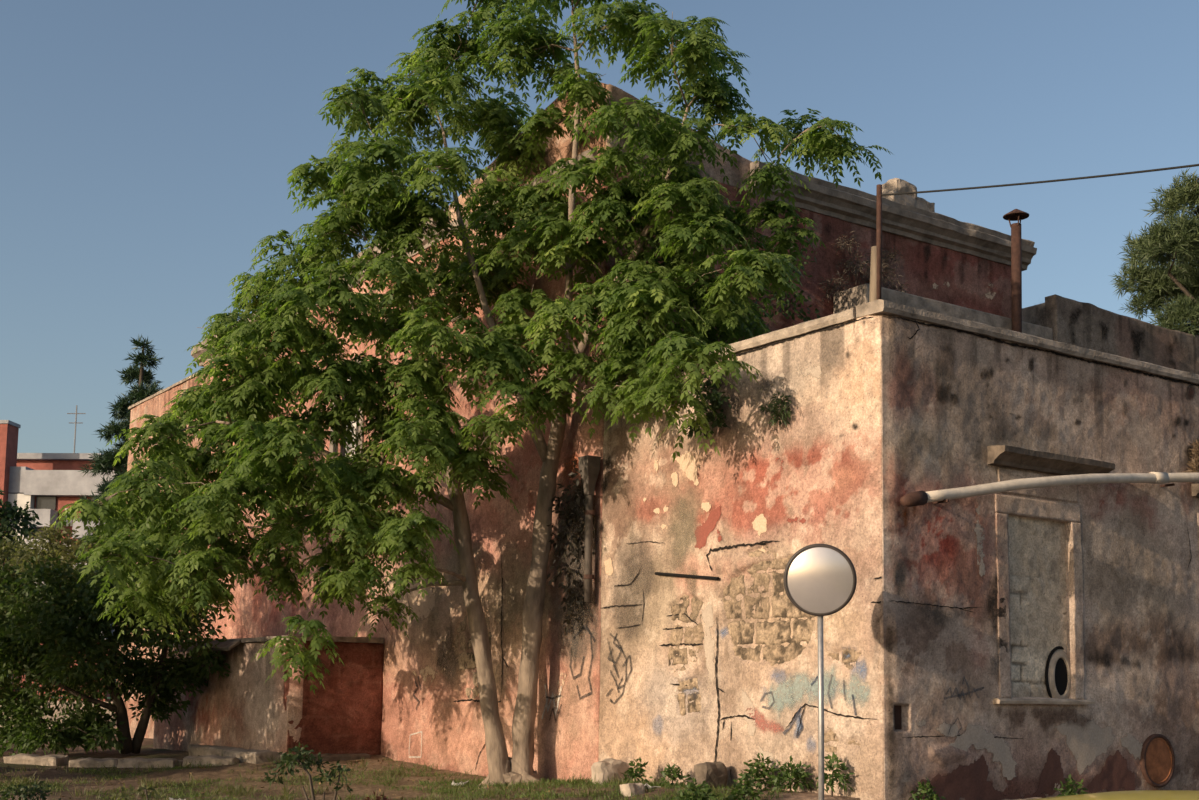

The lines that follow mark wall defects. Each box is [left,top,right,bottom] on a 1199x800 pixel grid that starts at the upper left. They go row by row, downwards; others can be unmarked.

water stain [937,386,958,404]
spalling [668,514,816,716]
spalling [828,648,862,670]
peeling [913,713,1143,800]